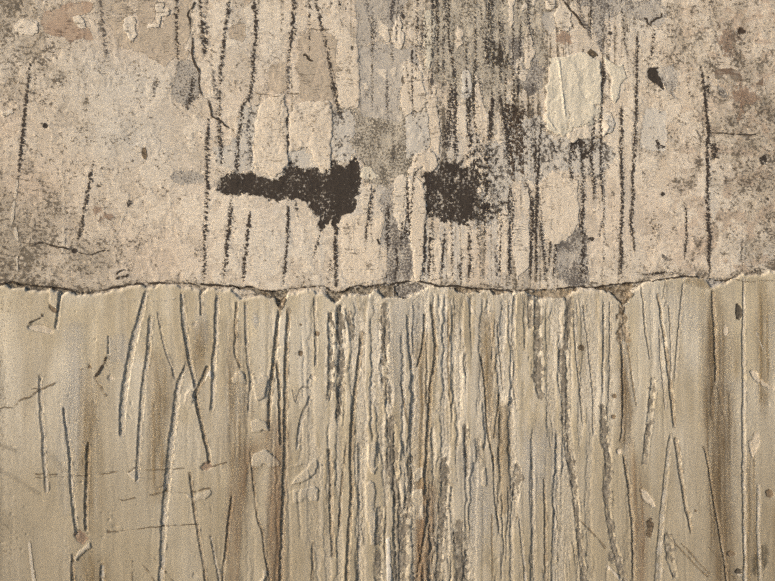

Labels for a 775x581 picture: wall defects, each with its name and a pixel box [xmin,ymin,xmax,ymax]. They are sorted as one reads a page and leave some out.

peeling [15,1,93,42]
crack [187,2,234,132]
peeling [170,170,204,186]
crack [0,242,770,297]
spalling [212,0,697,581]